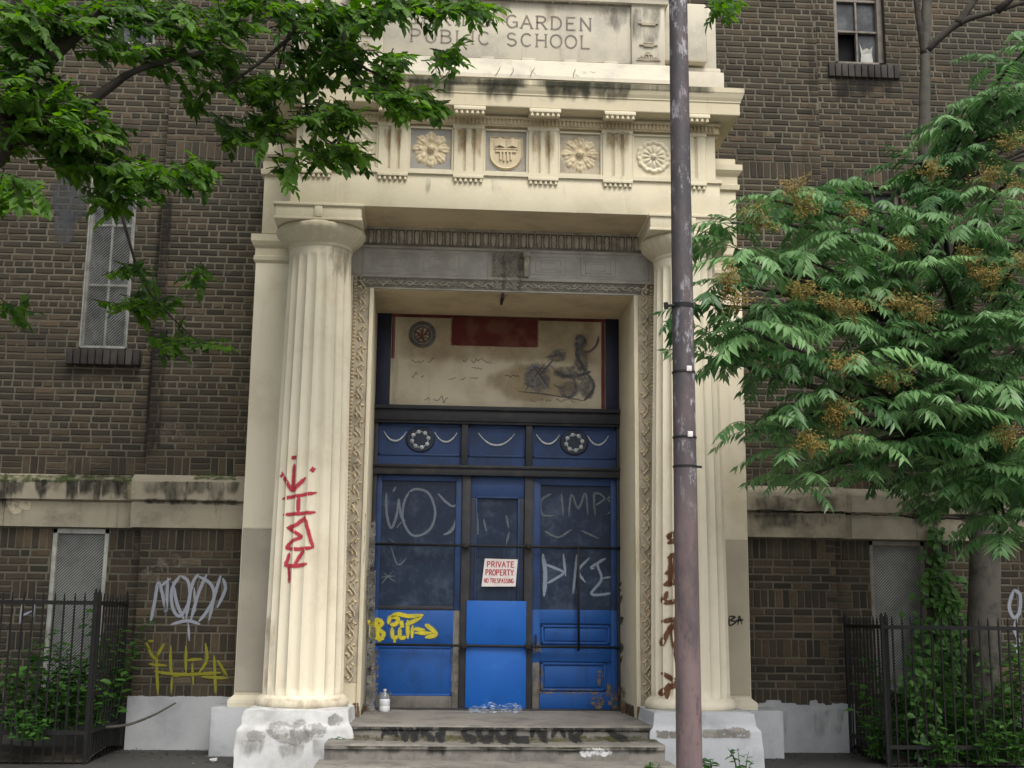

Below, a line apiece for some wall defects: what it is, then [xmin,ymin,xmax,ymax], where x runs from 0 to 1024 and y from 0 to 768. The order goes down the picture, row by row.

damp [478,79,516,97]
damp [546,82,630,97]
damp [0,480,20,505]
damp [36,480,46,500]
damp [67,480,129,499]
damp [146,482,238,505]
spalling [247,514,394,745]
peeling [451,650,459,697]